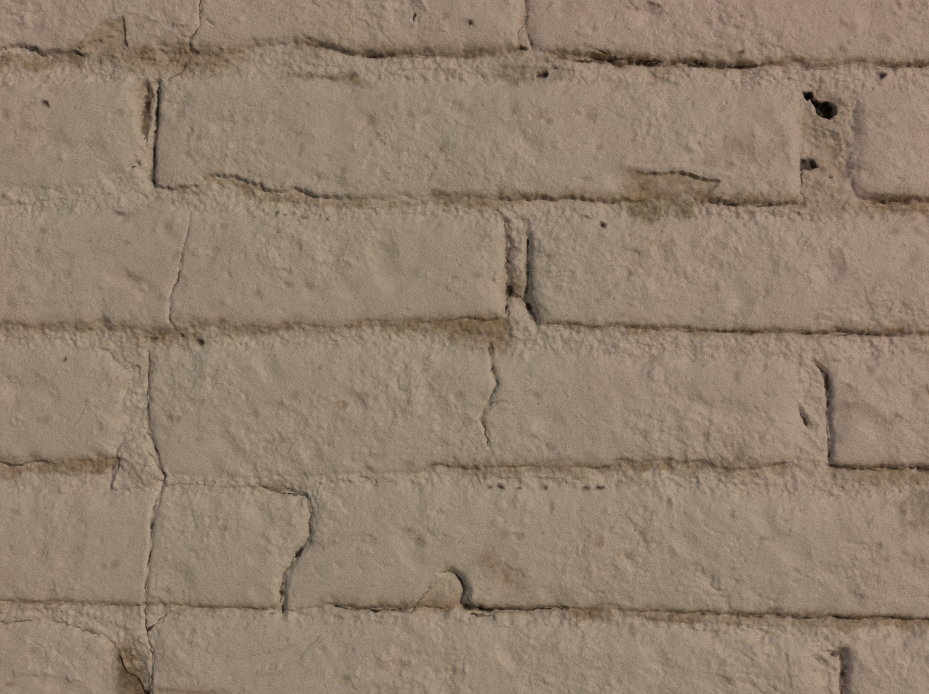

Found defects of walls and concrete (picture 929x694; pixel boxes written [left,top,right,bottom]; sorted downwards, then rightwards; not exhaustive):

spalling [793,85,876,223]
crack [479,345,502,445]
crack [799,363,831,458]
crack [143,356,168,694]
crack [261,485,312,614]
spalling [409,552,531,616]
spalling [102,641,233,694]
crack [814,651,848,694]